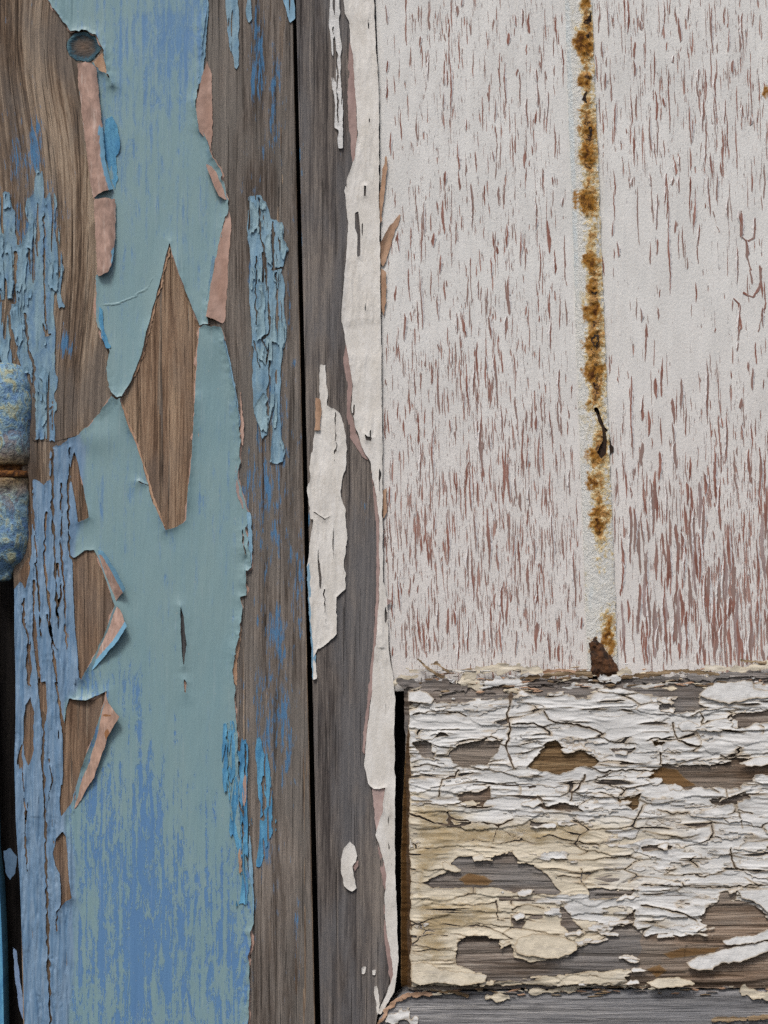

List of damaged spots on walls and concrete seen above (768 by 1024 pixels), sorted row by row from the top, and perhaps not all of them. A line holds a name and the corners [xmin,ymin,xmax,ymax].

rust [572,0,598,166]
rust [572,189,598,214]
rust [580,252,604,391]
peeling [0,0,393,1024]
rust [585,447,603,532]
crack [408,770,513,840]
crack [504,692,514,769]
peeling [528,740,598,775]
crack [544,711,604,735]
crack [659,722,701,764]
peeling [637,738,768,805]
peeling [411,886,768,989]